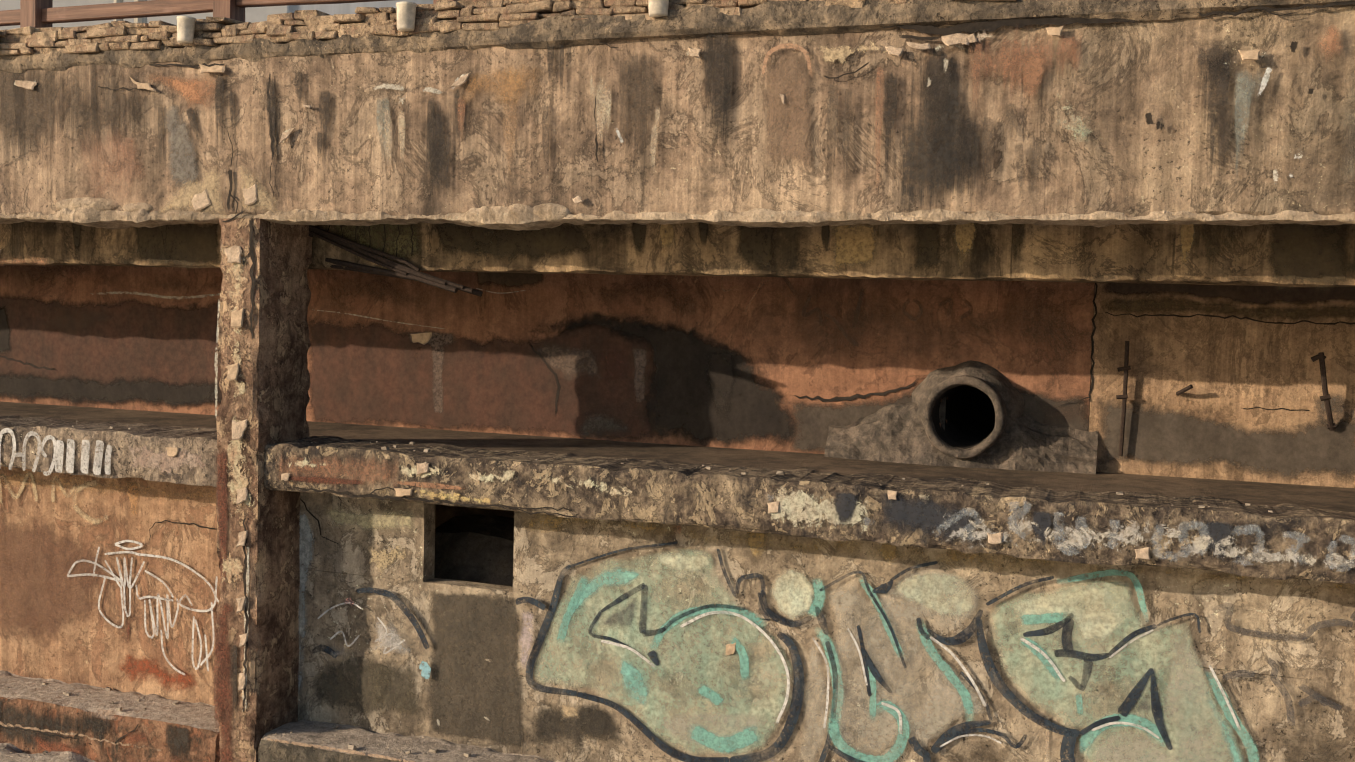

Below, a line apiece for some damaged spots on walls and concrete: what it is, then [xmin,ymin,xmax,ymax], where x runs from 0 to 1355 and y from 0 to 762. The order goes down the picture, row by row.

leakage [374,84,405,149]
leakage [423,87,460,190]
leakage [616,54,654,159]
leakage [703,33,733,148]
leakage [875,52,995,210]
leakage [1198,43,1272,173]
peeling [299,514,312,637]
peeling [767,486,869,535]
peeling [943,513,1355,568]